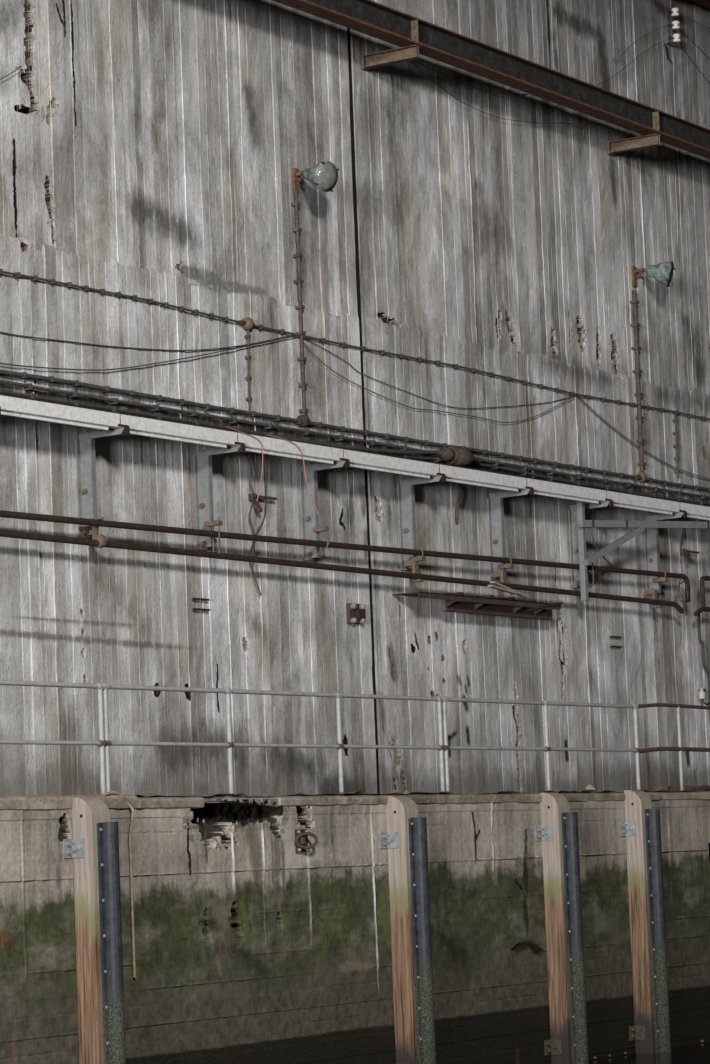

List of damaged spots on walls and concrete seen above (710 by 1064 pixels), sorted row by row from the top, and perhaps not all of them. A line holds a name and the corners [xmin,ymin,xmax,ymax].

spalling [44,175,55,245]
spalling [495,309,517,347]
spalling [550,310,623,381]
spalling [187,799,315,854]
damp [338,833,388,974]
crack [511,829,544,955]